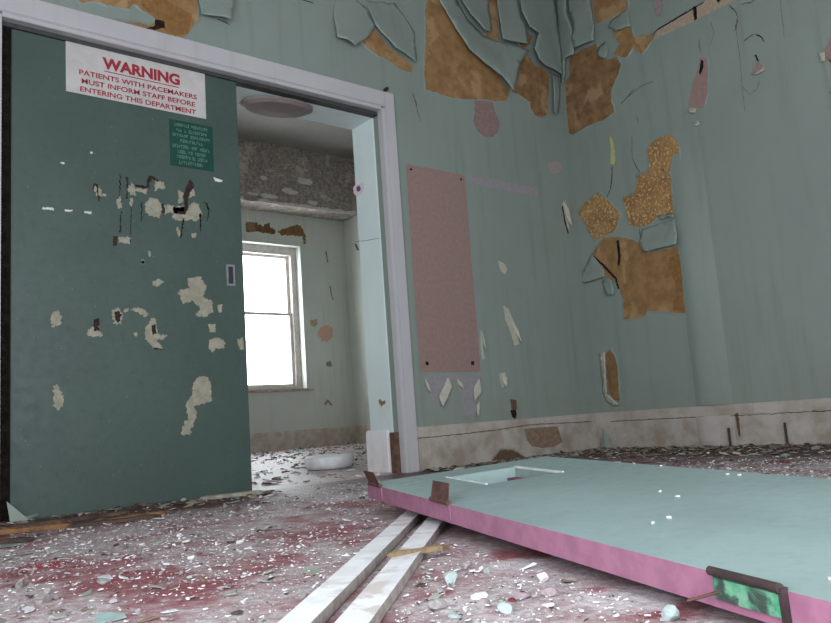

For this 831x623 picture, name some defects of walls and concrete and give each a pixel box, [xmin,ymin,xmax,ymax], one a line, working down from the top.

spalling [76,0,235,39]
spalling [333,0,734,136]
spalling [113,176,203,246]
spalling [244,221,307,245]
spalling [561,133,686,321]
spalling [178,276,226,353]
spalling [309,318,334,343]
spalling [181,376,212,436]
spalling [599,347,621,406]
peeling [524,426,563,448]